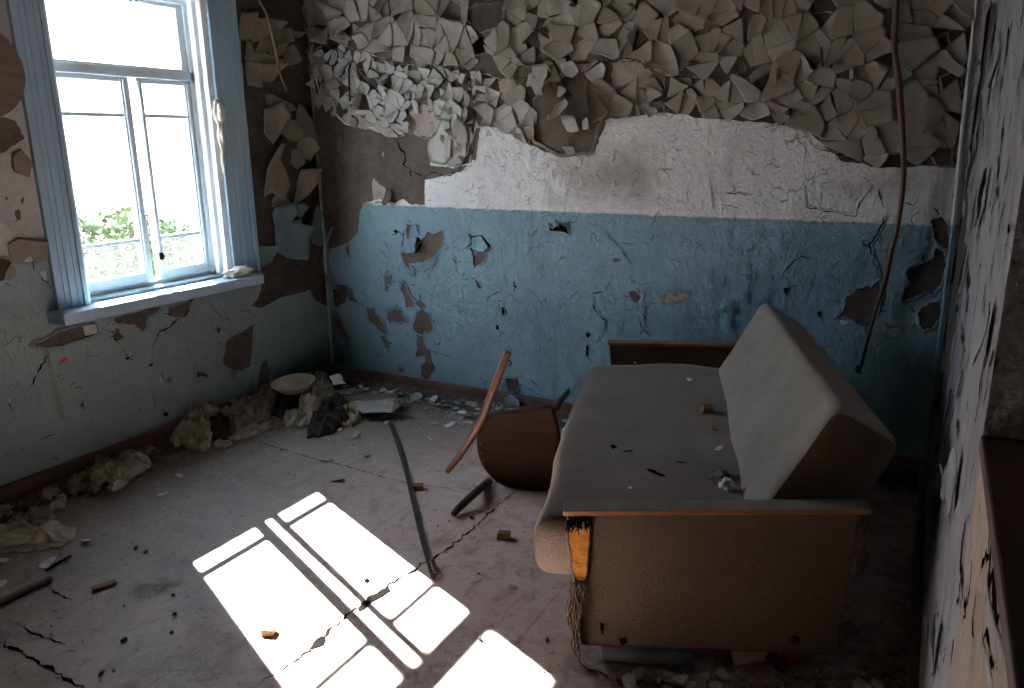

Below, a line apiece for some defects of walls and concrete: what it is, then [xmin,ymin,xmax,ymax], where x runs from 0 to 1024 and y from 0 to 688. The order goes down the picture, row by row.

peeling [0,99,51,290]
crack [30,347,52,386]
peeling [28,298,195,351]
peeling [213,323,271,387]
peeling [235,0,1024,552]
crack [720,191,752,208]
crack [764,123,918,278]
crack [0,622,84,688]
crack [253,490,517,688]
peeling [949,470,1008,688]